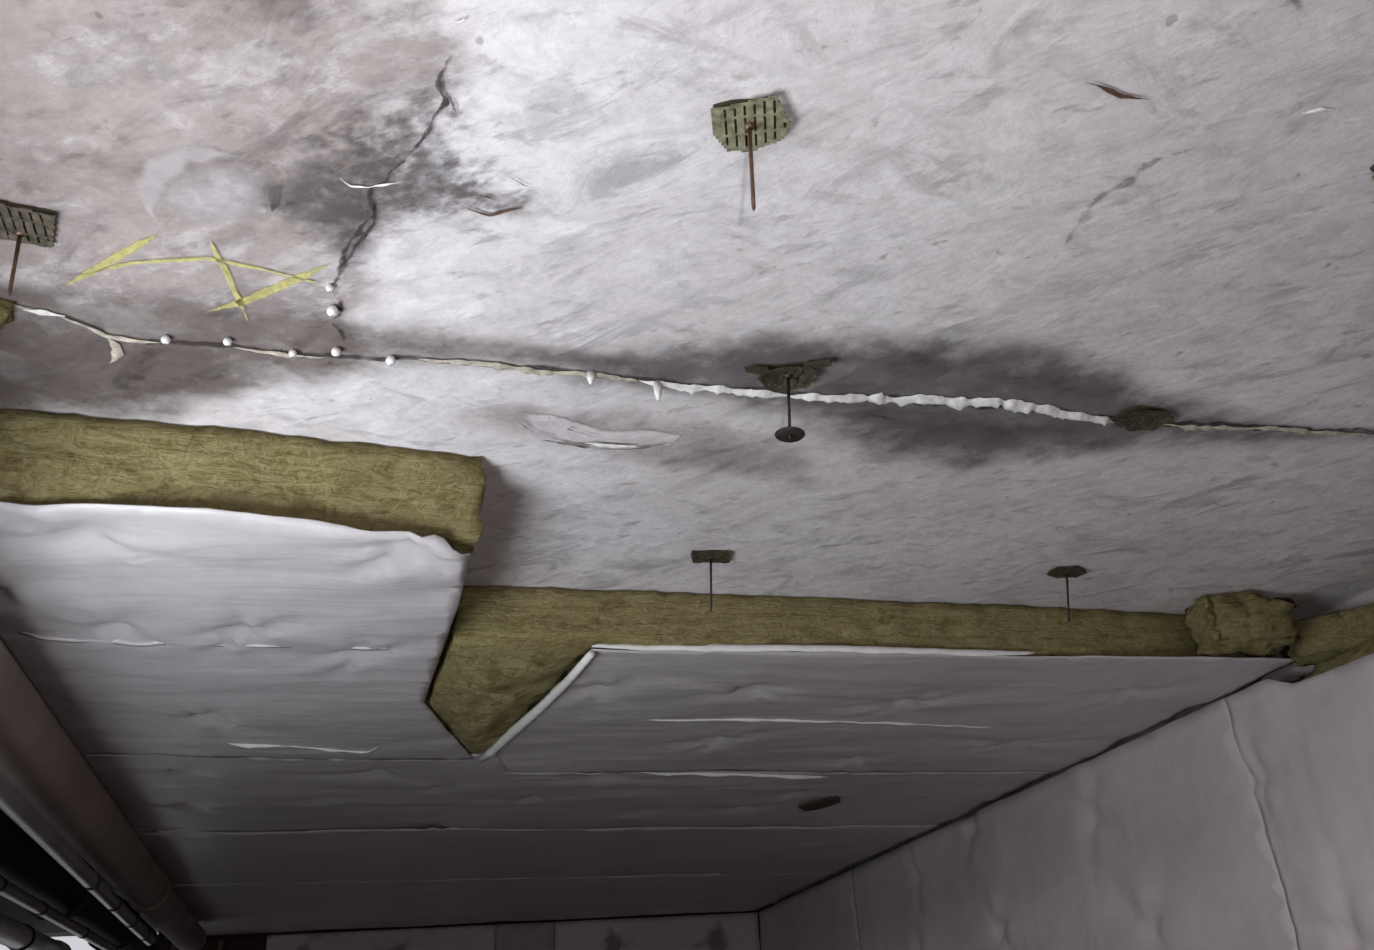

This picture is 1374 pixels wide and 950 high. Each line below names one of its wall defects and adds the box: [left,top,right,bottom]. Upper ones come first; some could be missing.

damp [0,0,549,414]
crack [13,60,1122,426]
damp [574,341,1294,471]
crack [1156,421,1374,437]